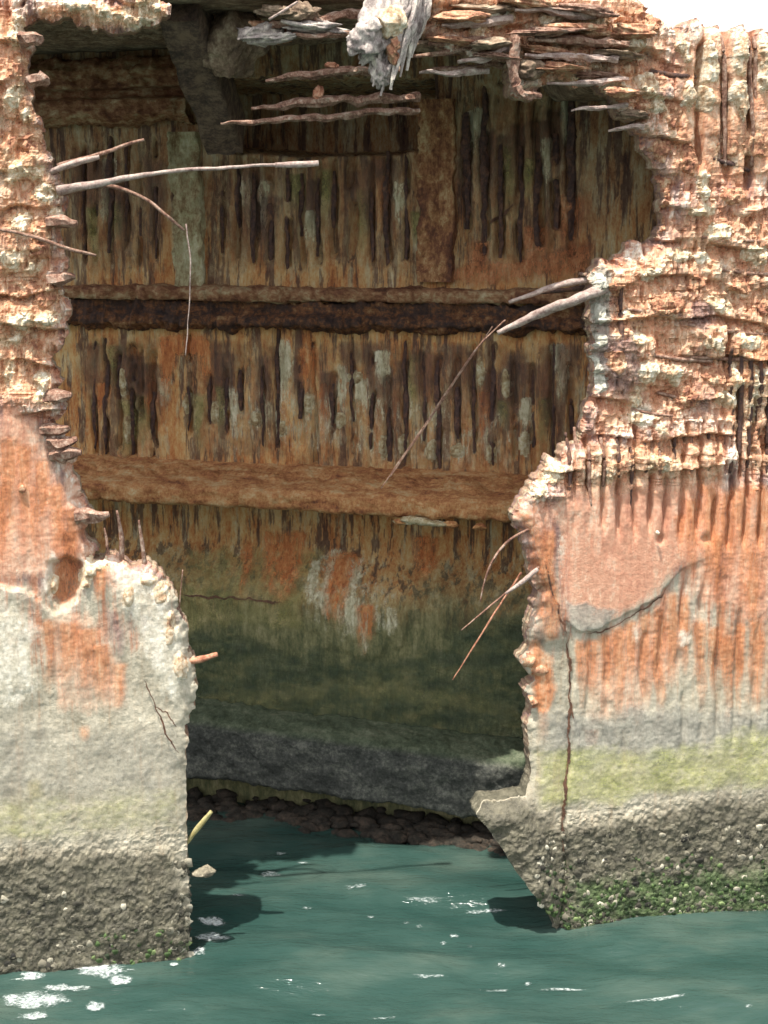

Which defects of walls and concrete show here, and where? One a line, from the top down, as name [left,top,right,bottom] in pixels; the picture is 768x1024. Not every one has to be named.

spalling [0,0,337,410]
rust [0,414,76,572]
spalling [182,0,768,813]
rust [43,619,123,694]
crack [146,683,179,753]
leakage [305,550,397,648]
rust [522,513,558,711]
crack [545,564,668,851]
rust [576,487,768,711]
leakage [477,796,768,930]